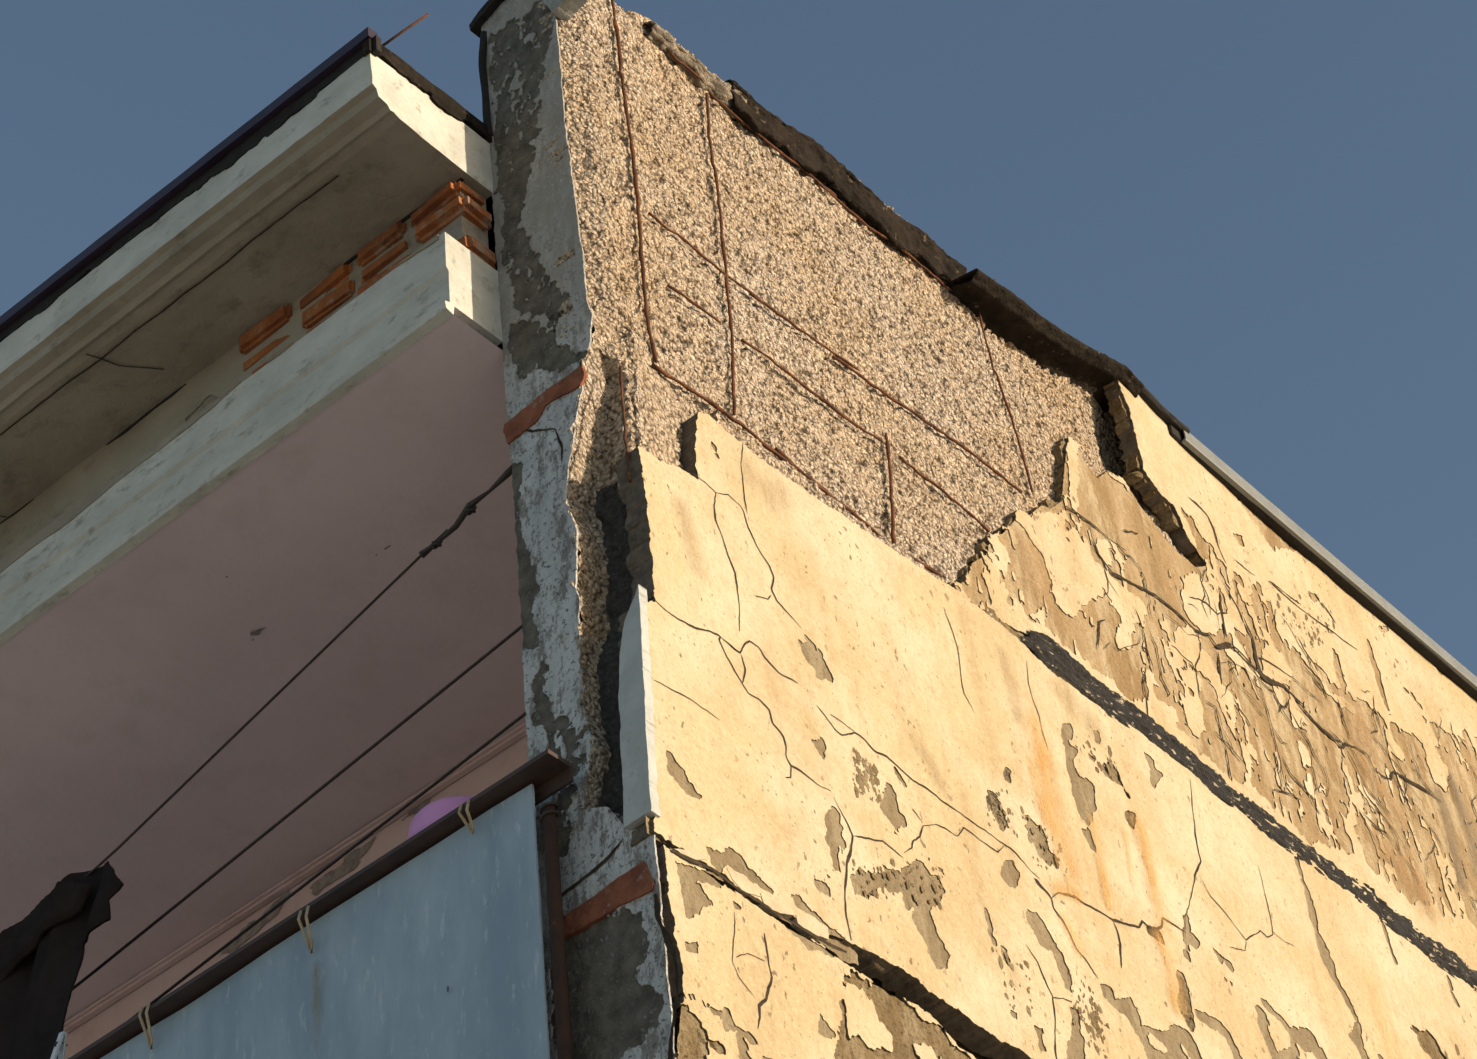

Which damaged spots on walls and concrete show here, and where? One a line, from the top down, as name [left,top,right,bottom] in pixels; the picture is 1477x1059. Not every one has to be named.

crack [0,175,339,436]
spalling [488,0,1477,930]
crack [654,445,1294,1059]
crack [1065,499,1477,910]
peeling [550,907,768,1059]
peeling [814,806,949,970]
peeling [818,972,970,1059]
peeling [984,908,1046,1052]
peeling [1026,910,1242,1059]
peeling [1255,998,1326,1059]
peeling [1294,858,1382,1059]
peeling [1411,1027,1465,1059]